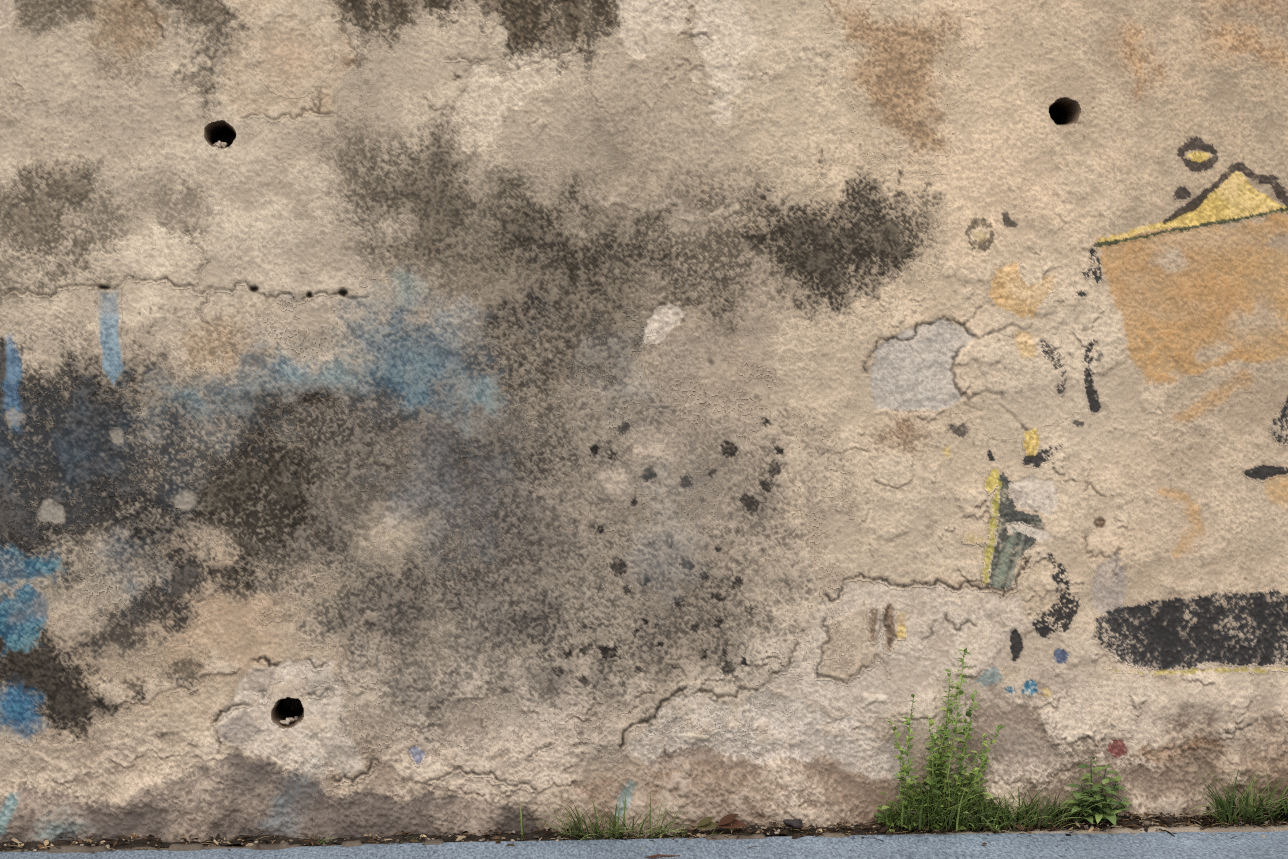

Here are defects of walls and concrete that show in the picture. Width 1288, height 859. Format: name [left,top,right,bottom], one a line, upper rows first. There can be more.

crack [0,225,354,326]
spalling [869,318,957,412]
damp [0,0,954,846]
crack [211,702,252,751]
crack [248,654,349,736]
crack [329,756,381,785]
crack [425,741,556,793]
crack [617,554,1034,760]